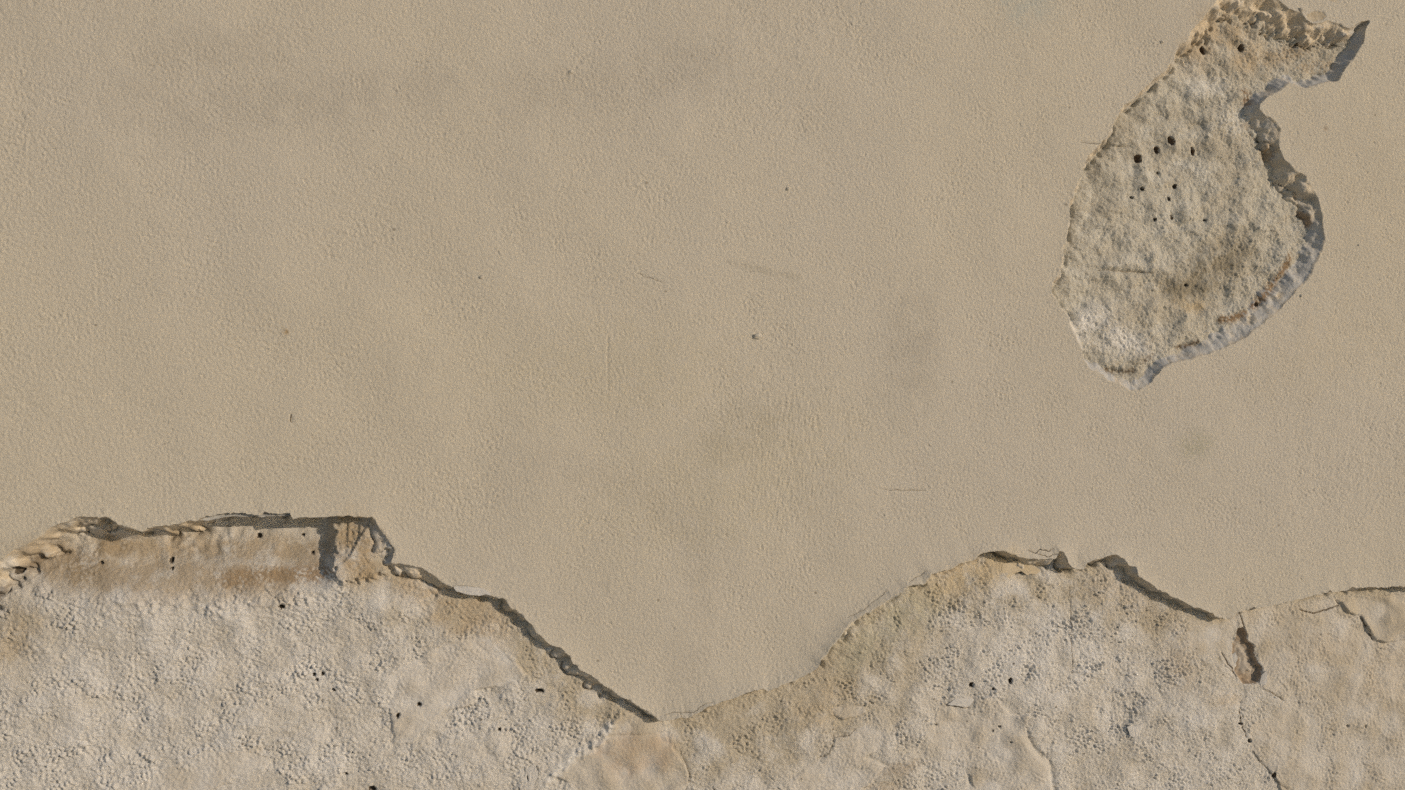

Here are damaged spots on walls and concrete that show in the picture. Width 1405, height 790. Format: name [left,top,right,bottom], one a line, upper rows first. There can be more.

spalling [1217,0,1370,60]
spalling [1051,71,1305,391]
spalling [49,516,118,531]
spalling [161,512,328,538]
spalling [0,551,1405,790]